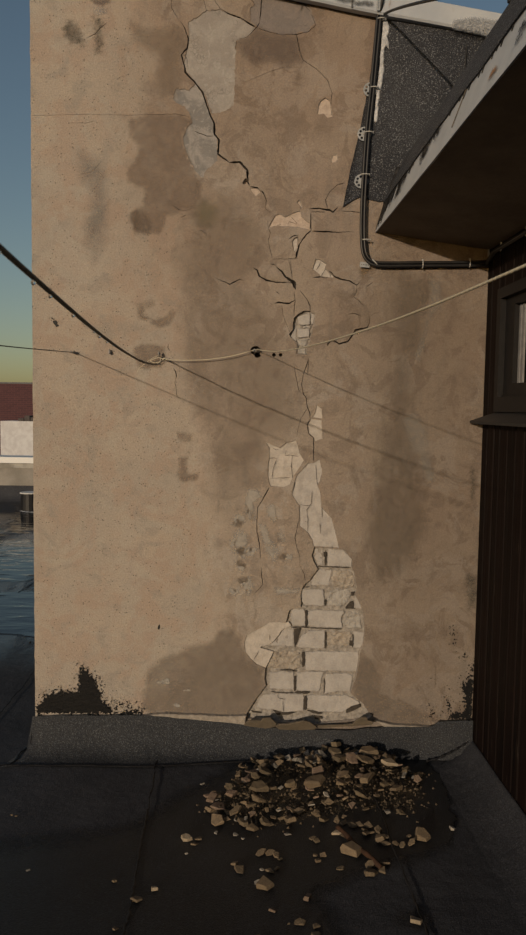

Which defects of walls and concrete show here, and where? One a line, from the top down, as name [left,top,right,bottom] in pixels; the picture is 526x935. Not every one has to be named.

flaking render [173,10,255,177]
spalling [317,98,333,118]
crack [171,0,373,346]
spalling [267,199,310,252]
spalling [289,311,316,355]
crack [294,358,314,461]
spalling [308,405,323,442]
crack [256,488,269,592]
spalling [244,440,374,730]